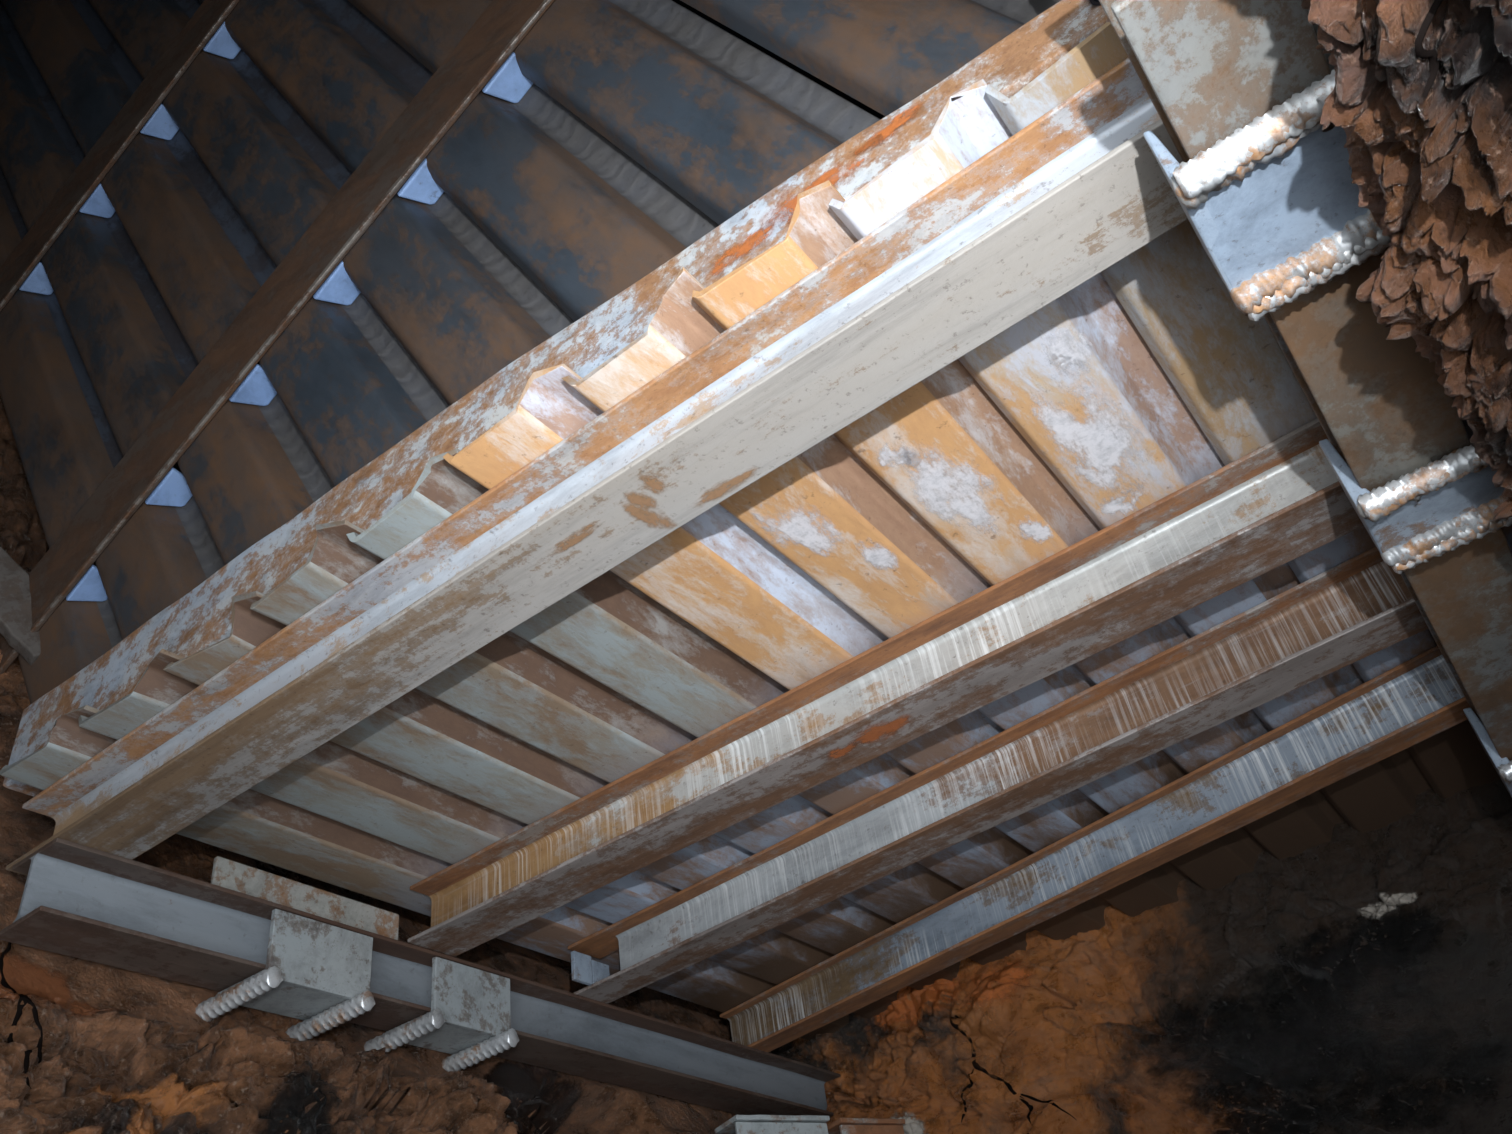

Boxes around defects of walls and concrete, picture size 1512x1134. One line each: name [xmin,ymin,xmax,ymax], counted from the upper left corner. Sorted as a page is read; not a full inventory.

peeling [1034,331,1143,514]
peeling [880,445,993,530]
peeling [756,510,840,556]
peeling [864,544,897,568]
peeling [1020,520,1052,541]
crack [0,942,43,1088]
crack [950,1015,1076,1134]